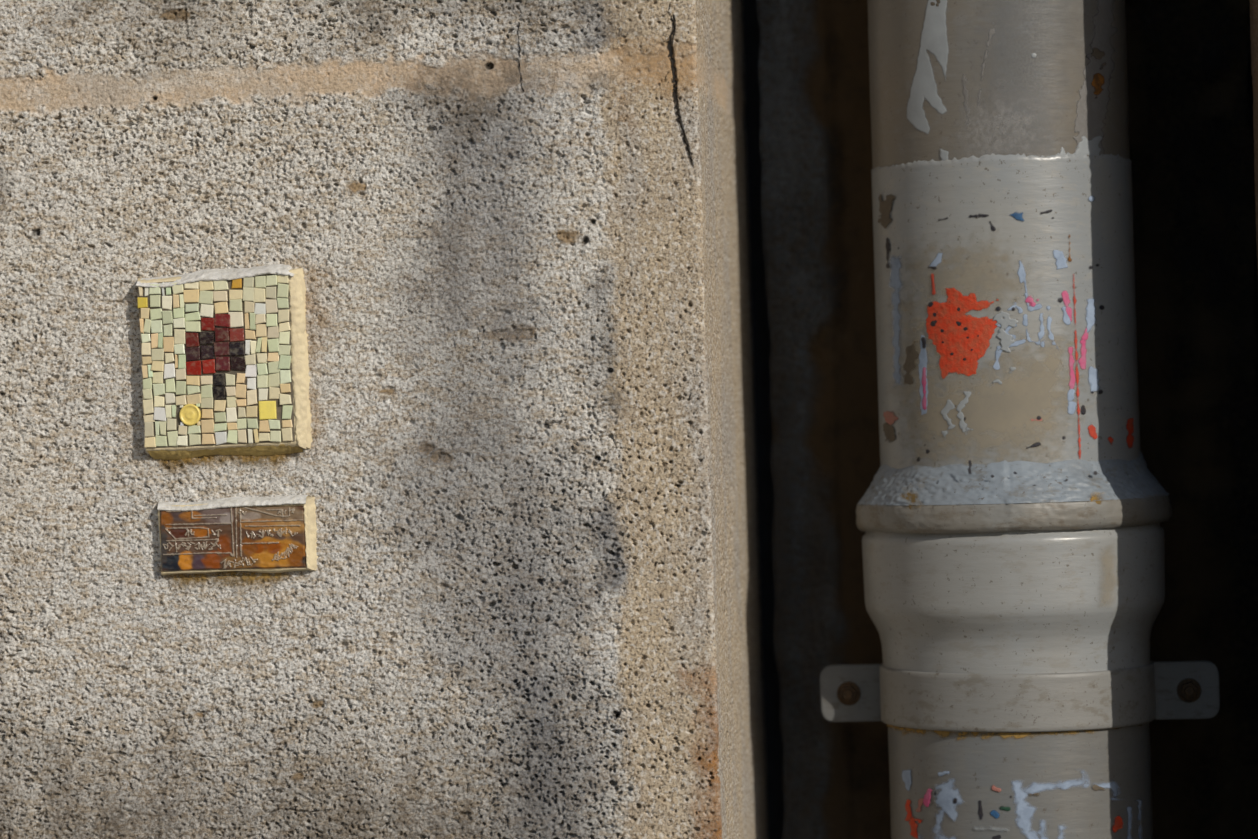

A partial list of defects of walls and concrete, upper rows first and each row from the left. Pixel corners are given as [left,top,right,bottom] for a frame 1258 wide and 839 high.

crack [663,6,692,166]
peeling [907,0,949,134]
peeling [903,267,979,410]
peeling [941,391,973,437]
peeling [975,785,1012,839]
peeling [1026,778,1118,797]